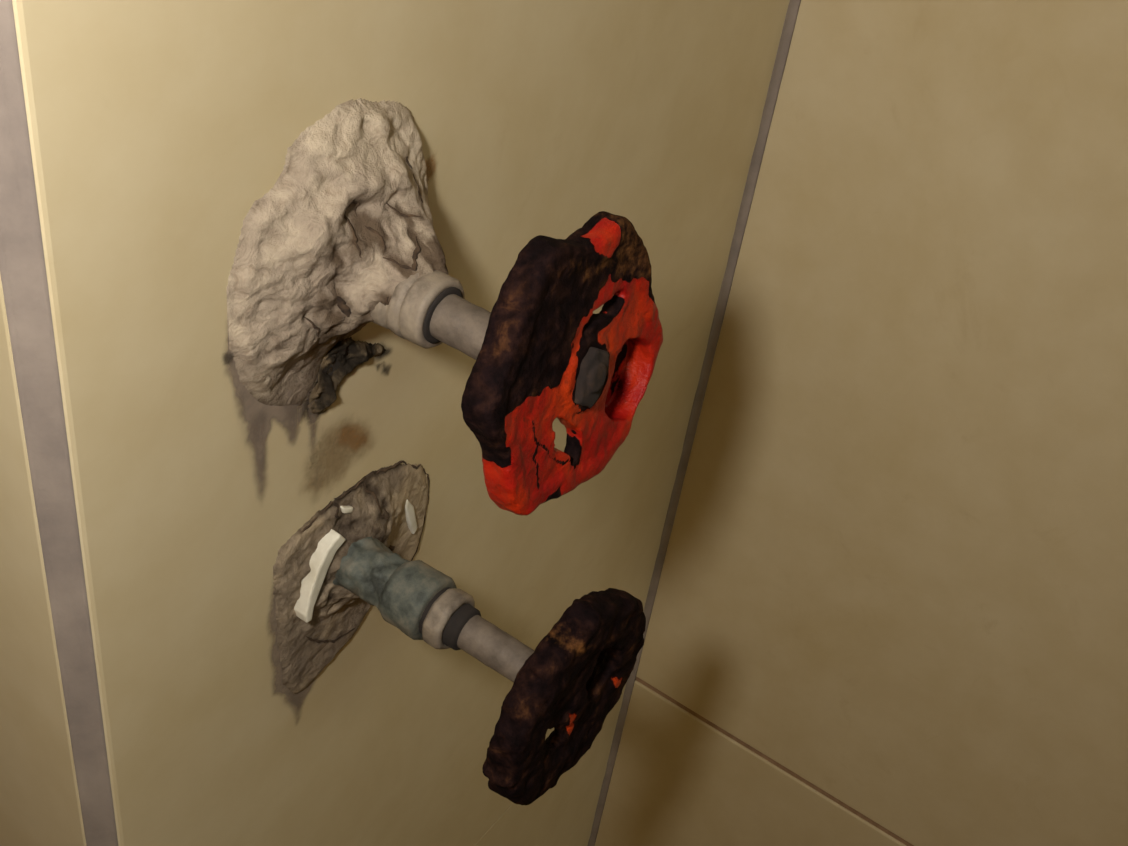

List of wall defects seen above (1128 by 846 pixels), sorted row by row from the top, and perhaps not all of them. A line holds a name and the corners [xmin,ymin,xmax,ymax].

water stain [226,326,322,471]
water stain [269,588,315,708]